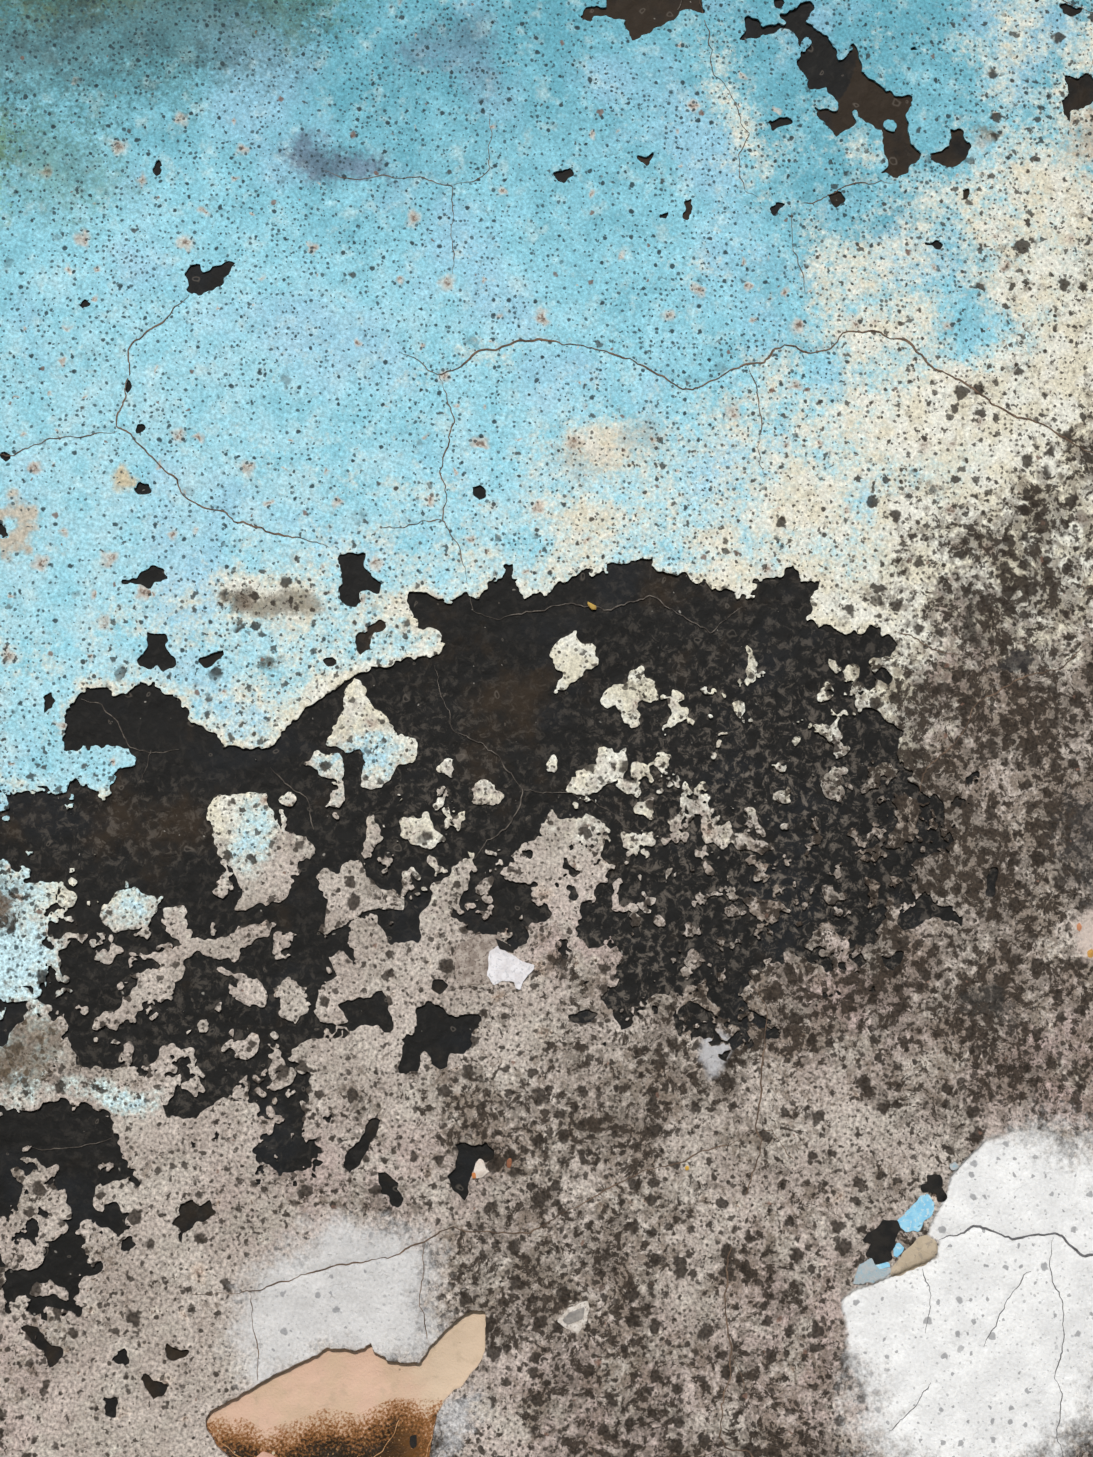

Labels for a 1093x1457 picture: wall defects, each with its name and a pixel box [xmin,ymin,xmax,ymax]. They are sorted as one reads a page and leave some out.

peeling [581,0,705,41]
peeling [740,0,971,178]
crack [0,296,328,547]
crack [381,330,1093,633]
peeling [0,553,979,1186]
peeling [0,1097,141,1367]
peeling [172,1200,216,1243]
corrosion [206,1397,444,1457]
peeling [378,1172,404,1207]
peeling [448,1142,494,1201]
crack [665,1239,753,1457]
crack [922,1225,1093,1457]